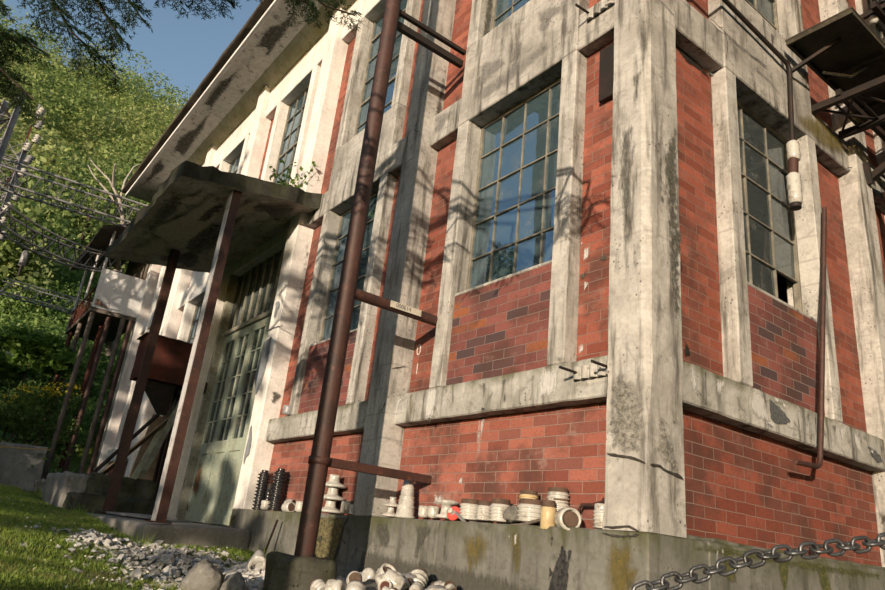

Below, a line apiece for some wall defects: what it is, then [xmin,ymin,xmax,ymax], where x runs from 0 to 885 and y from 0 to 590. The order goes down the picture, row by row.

damp [621,133,631,222]
damp [160,204,224,267]
damp [659,130,682,313]
peeling [768,398,792,428]
damp [358,524,531,590]